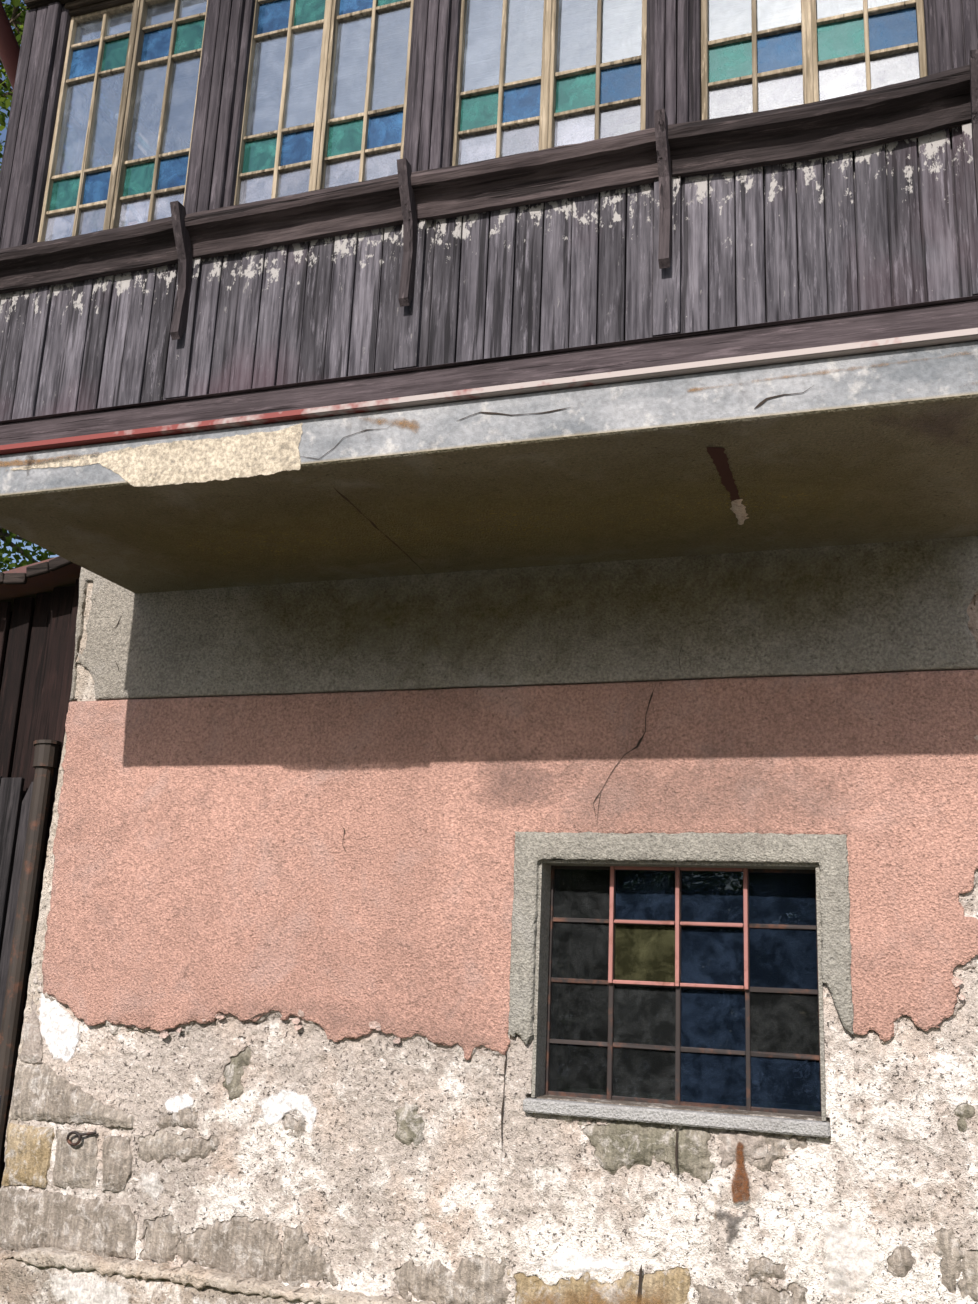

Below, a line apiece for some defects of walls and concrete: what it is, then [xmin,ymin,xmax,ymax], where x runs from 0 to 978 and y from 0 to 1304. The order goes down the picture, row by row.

spalling [11,423,303,486]
crack [457,407,570,421]
crack [593,645,683,818]
flaking render [1,731,978,1304]